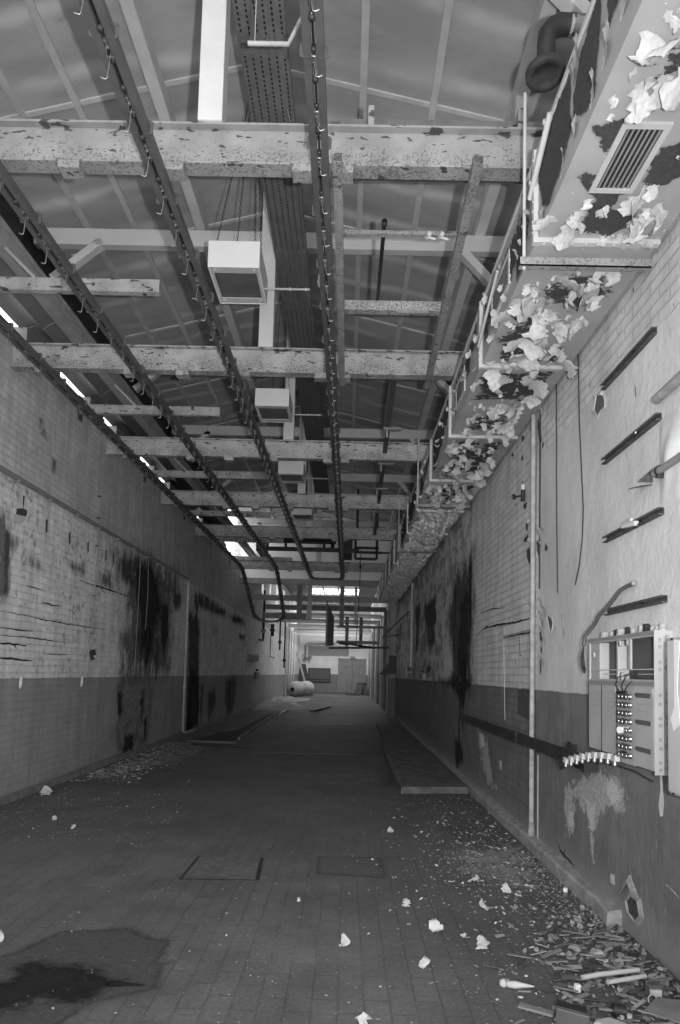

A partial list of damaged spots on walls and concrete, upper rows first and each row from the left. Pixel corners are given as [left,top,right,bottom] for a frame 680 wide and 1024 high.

peeling [399,0,680,548]
crack [0,585,109,661]
damp [102,551,236,730]
damp [453,555,471,744]
damp [0,928,170,1024]
peeling [363,785,644,1024]